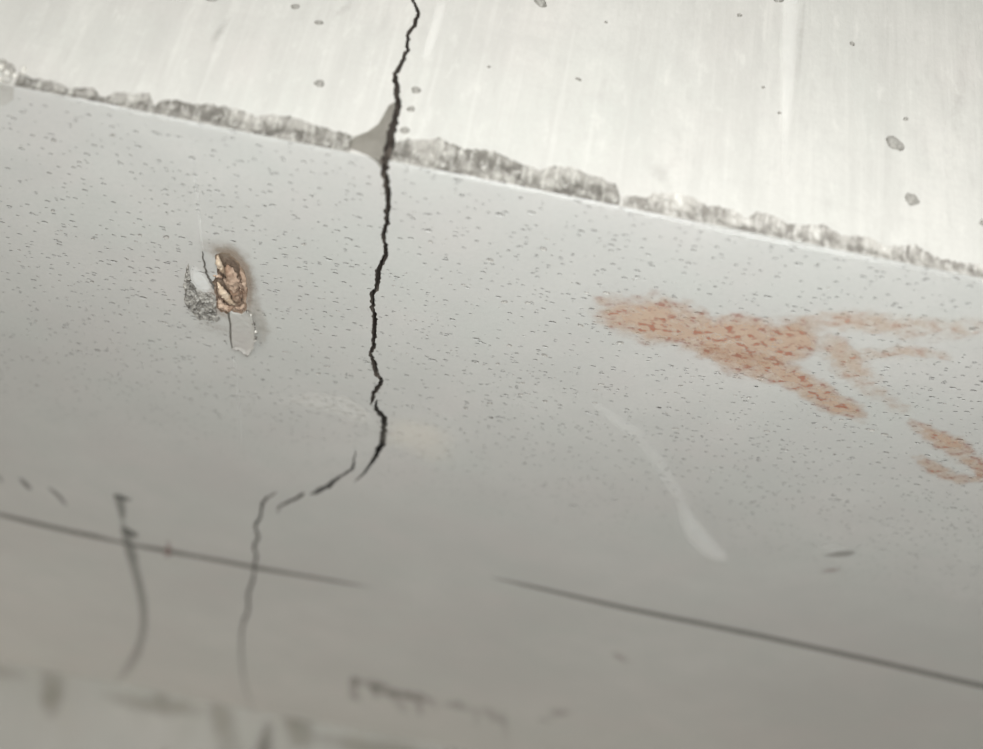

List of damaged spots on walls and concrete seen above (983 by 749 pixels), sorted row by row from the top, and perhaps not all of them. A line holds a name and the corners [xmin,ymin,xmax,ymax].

spalling [0,59,354,153]
spalling [390,137,983,278]
spalling [183,251,257,356]
crack [240,0,420,749]
corrosion [607,301,859,416]